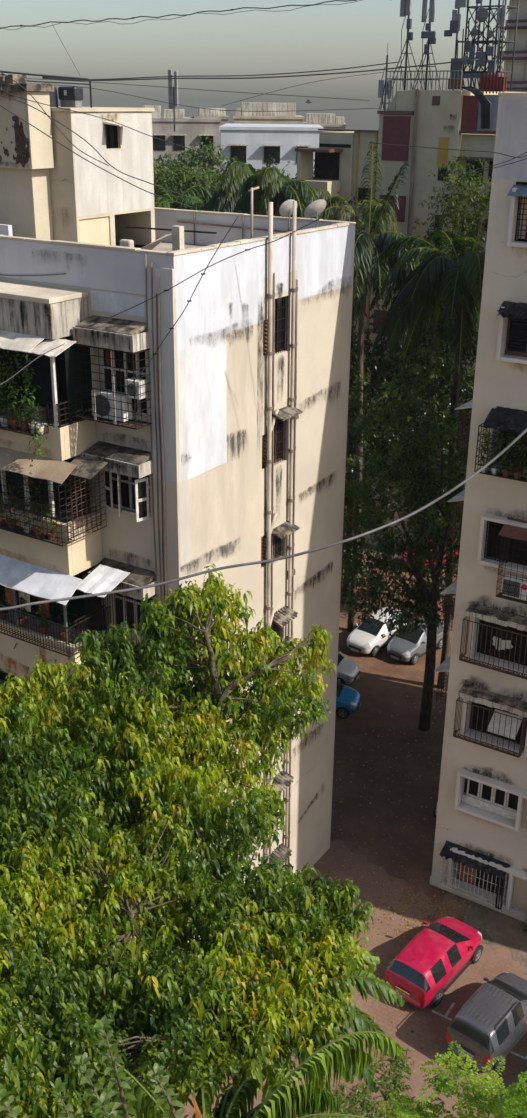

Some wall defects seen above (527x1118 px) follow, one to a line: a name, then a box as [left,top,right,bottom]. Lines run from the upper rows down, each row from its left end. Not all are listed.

peeling [0,115,30,168]
leakage [189,543,235,568]